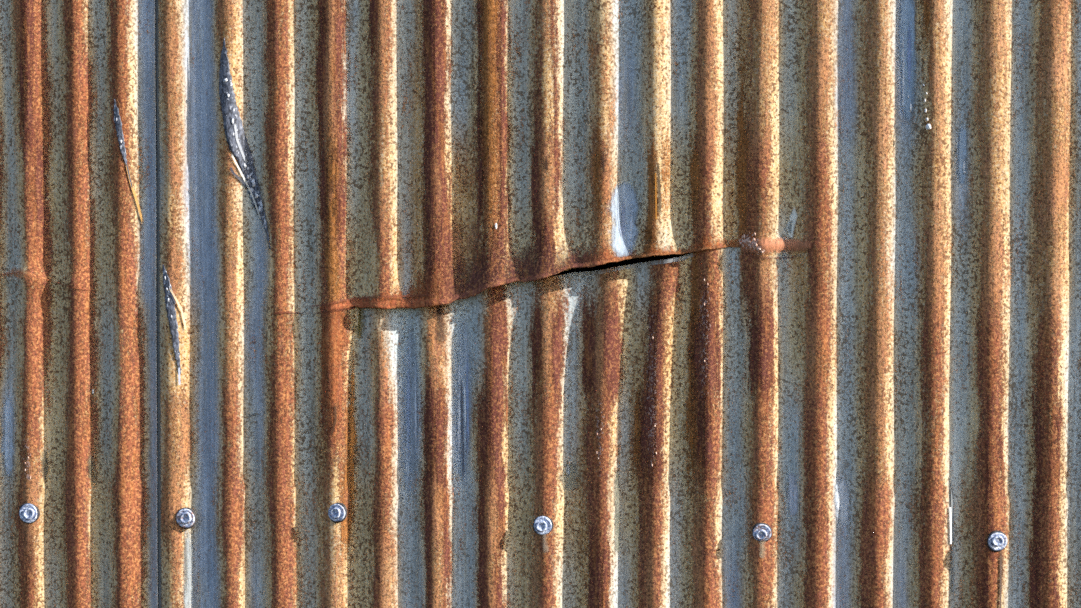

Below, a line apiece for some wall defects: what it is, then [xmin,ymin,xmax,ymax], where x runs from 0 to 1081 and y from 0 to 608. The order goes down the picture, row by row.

rust [0,0,851,608]
rust [845,0,1081,608]